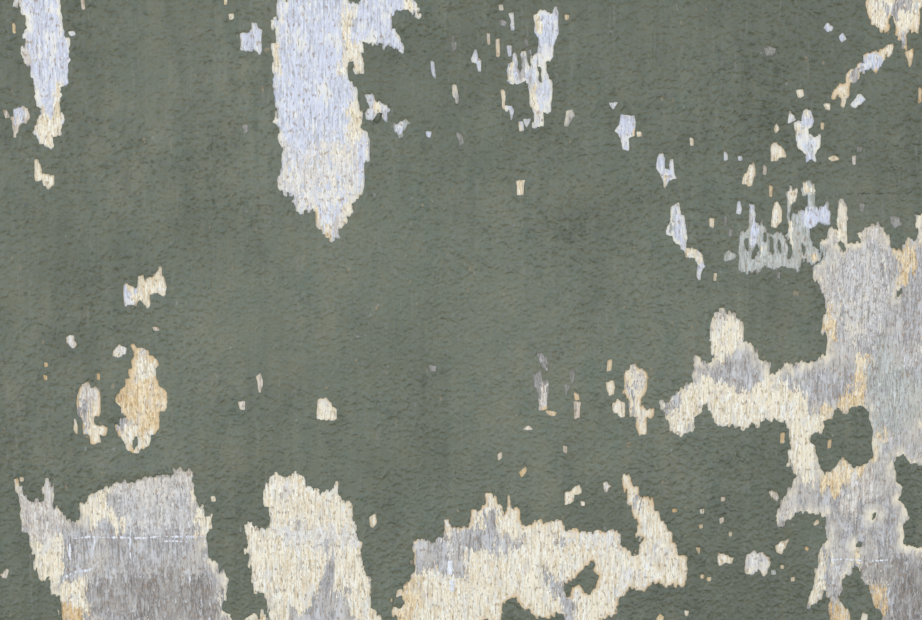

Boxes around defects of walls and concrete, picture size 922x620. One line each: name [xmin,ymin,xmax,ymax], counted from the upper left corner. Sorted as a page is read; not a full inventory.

peeling [12,0,71,149]
peeling [240,0,421,242]
peeling [501,6,559,129]
peeling [831,0,922,108]
peeling [516,180,525,195]
peeling [123,266,167,309]
peeling [76,344,167,454]
peeling [317,397,337,421]
peeling [533,352,549,411]
peeling [606,180,922,620]
peeling [14,466,232,620]
peeling [243,471,688,620]